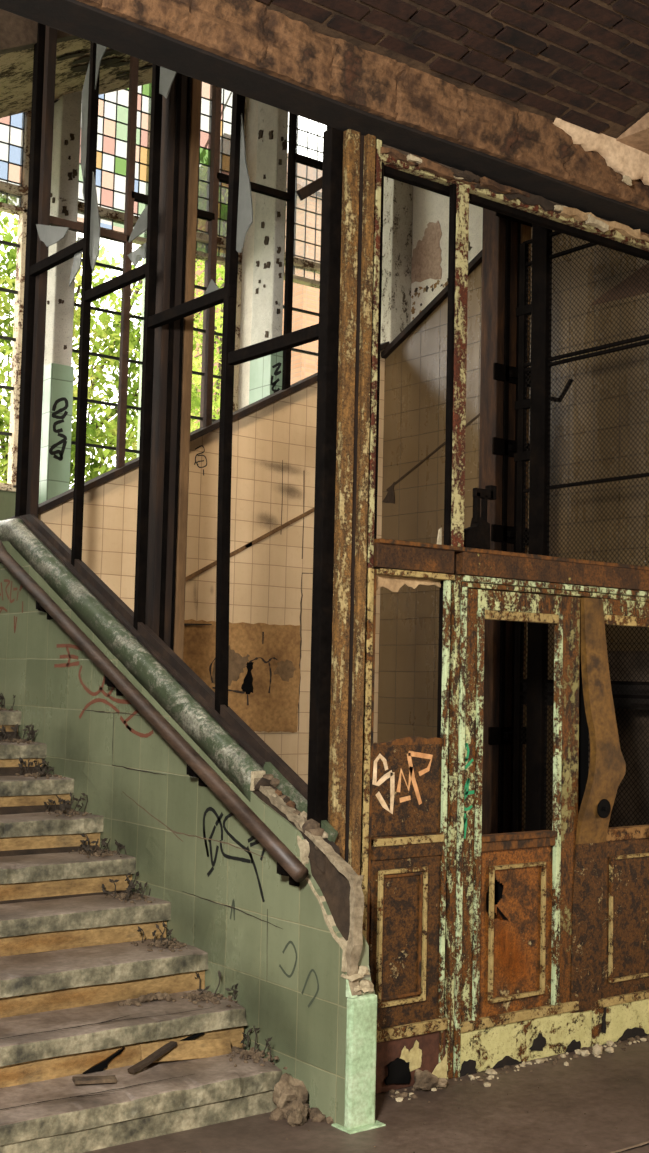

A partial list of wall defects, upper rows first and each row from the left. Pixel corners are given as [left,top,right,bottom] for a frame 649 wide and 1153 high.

flaking render [553,118,649,186]
flaking render [380,147,649,243]
peeling [411,221,448,319]
spalling [250,762,374,996]
peeling [601,1007,648,1042]
peeling [400,1040,477,1078]
peeling [493,1033,546,1069]
peeling [565,1039,581,1053]
crack [609,1141,649,1153]